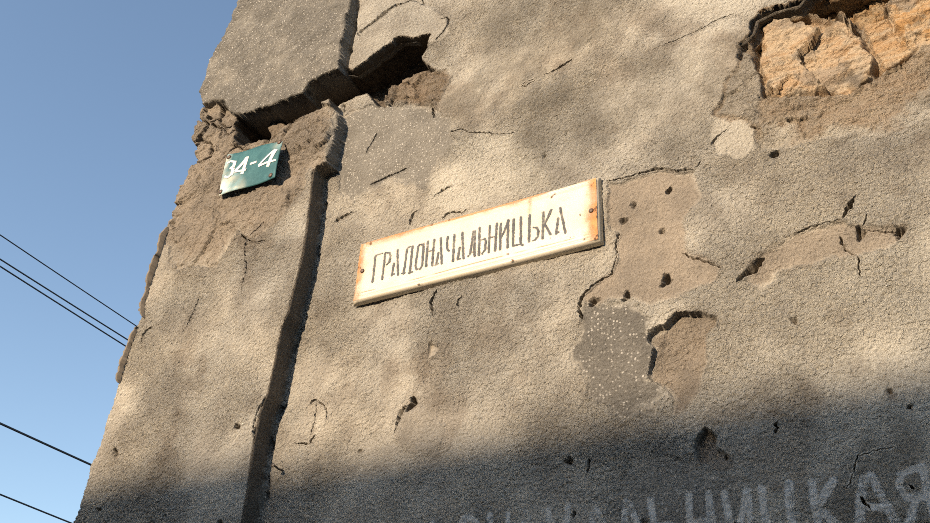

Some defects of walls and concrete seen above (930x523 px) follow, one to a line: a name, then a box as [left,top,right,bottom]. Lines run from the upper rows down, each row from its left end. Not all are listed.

crack [356,0,451,40]
spalling [707,0,930,160]
crack [202,116,266,152]
crack [239,221,266,293]
spalling [115,33,458,523]
crack [576,232,621,320]
spalling [567,170,722,425]
crack [795,194,898,277]